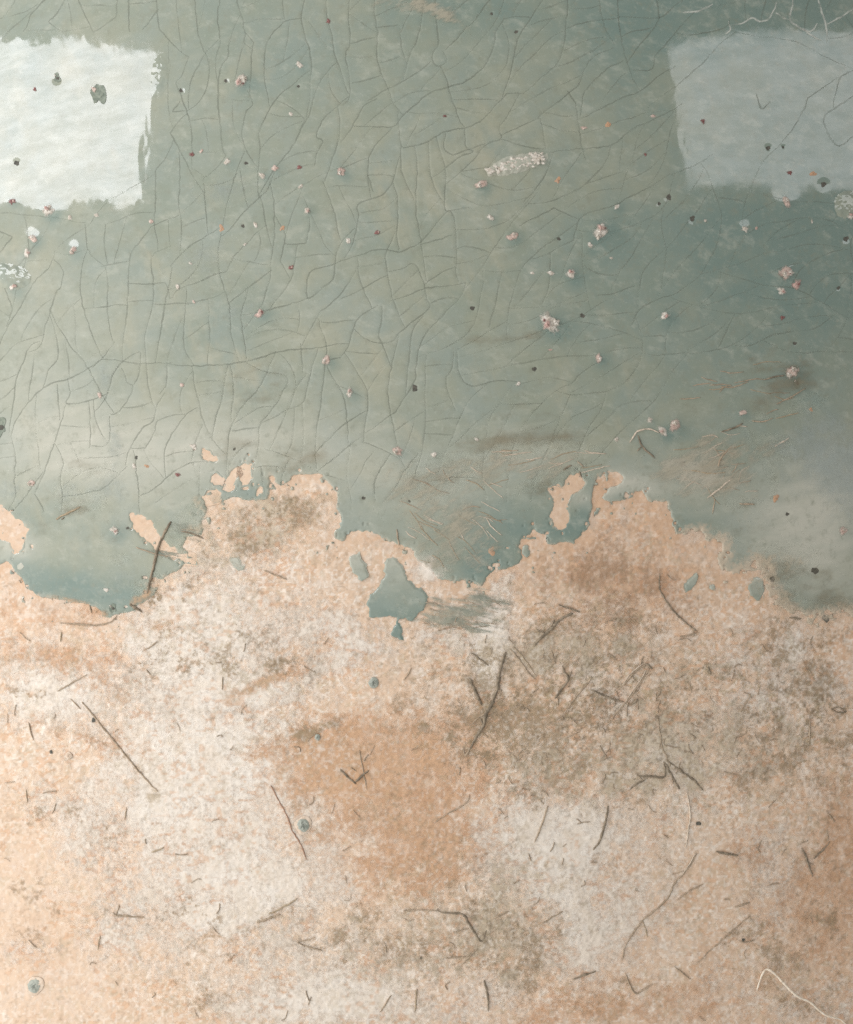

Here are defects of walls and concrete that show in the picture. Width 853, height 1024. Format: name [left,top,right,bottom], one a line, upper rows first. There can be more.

crack [684,0,853,41]
peeling [0,444,853,1024]